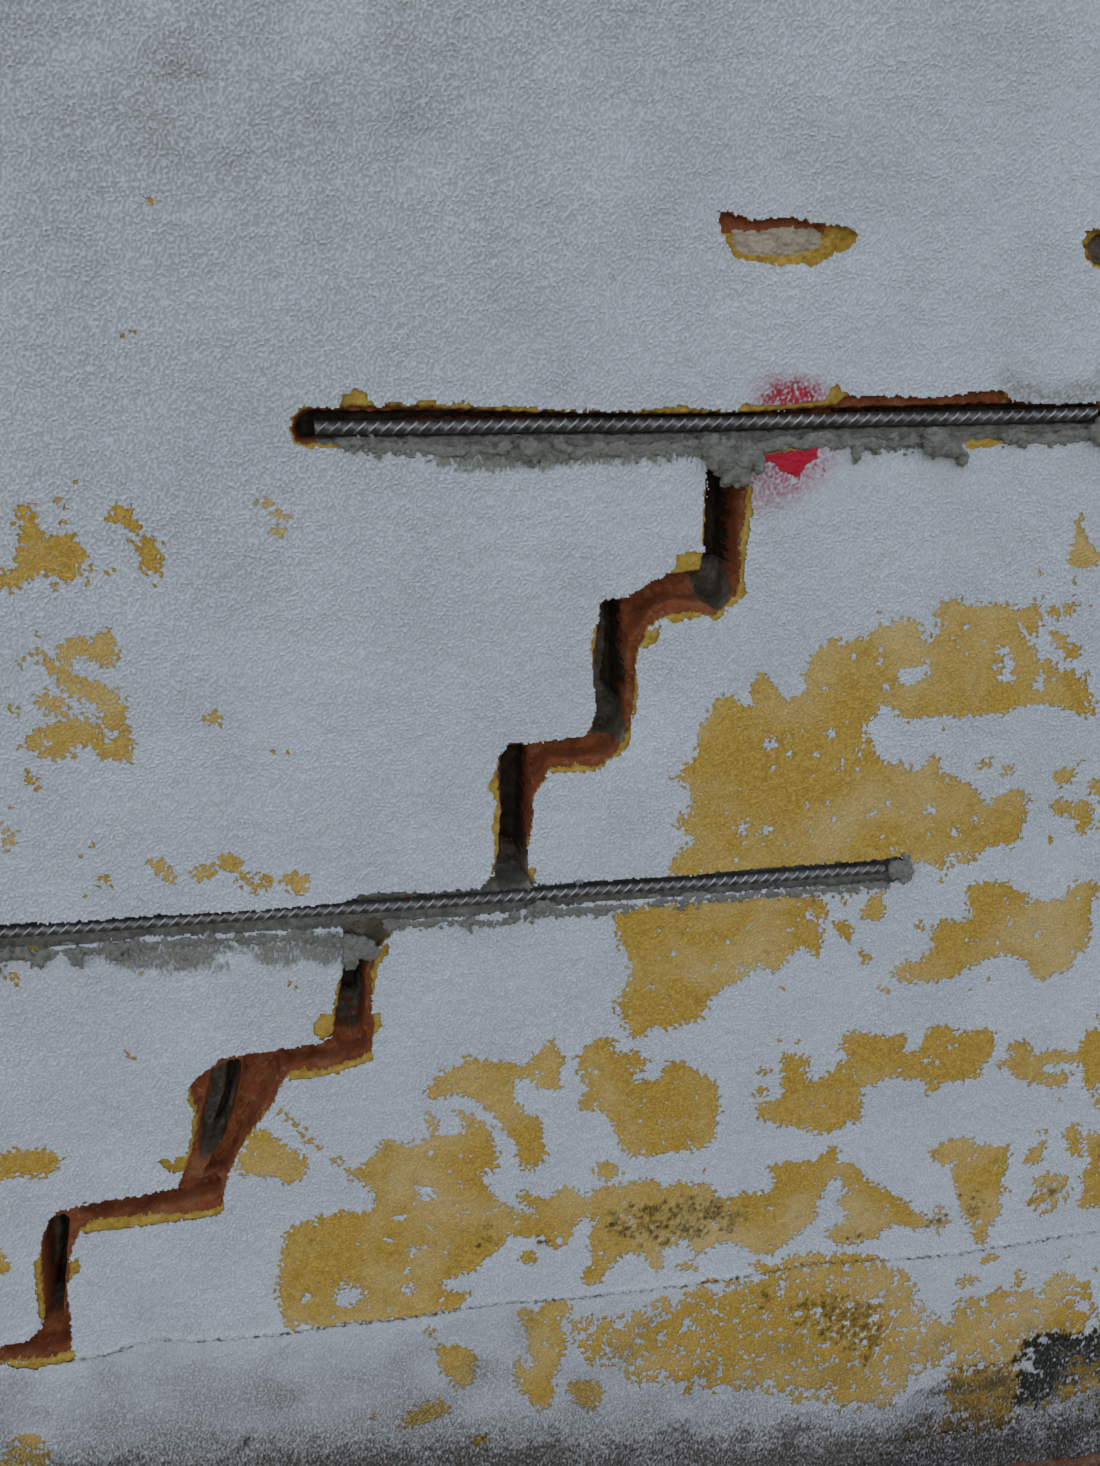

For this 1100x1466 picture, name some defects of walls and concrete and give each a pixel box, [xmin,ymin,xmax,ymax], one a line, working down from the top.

spalling [718,210,859,268]
spalling [289,384,1098,450]
peeling [0,480,117,595]
crack [487,469,754,883]
peeling [0,497,1100,1456]
crack [0,917,393,1371]
peeling [0,1433,51,1466]
leakage [52,1328,1100,1466]